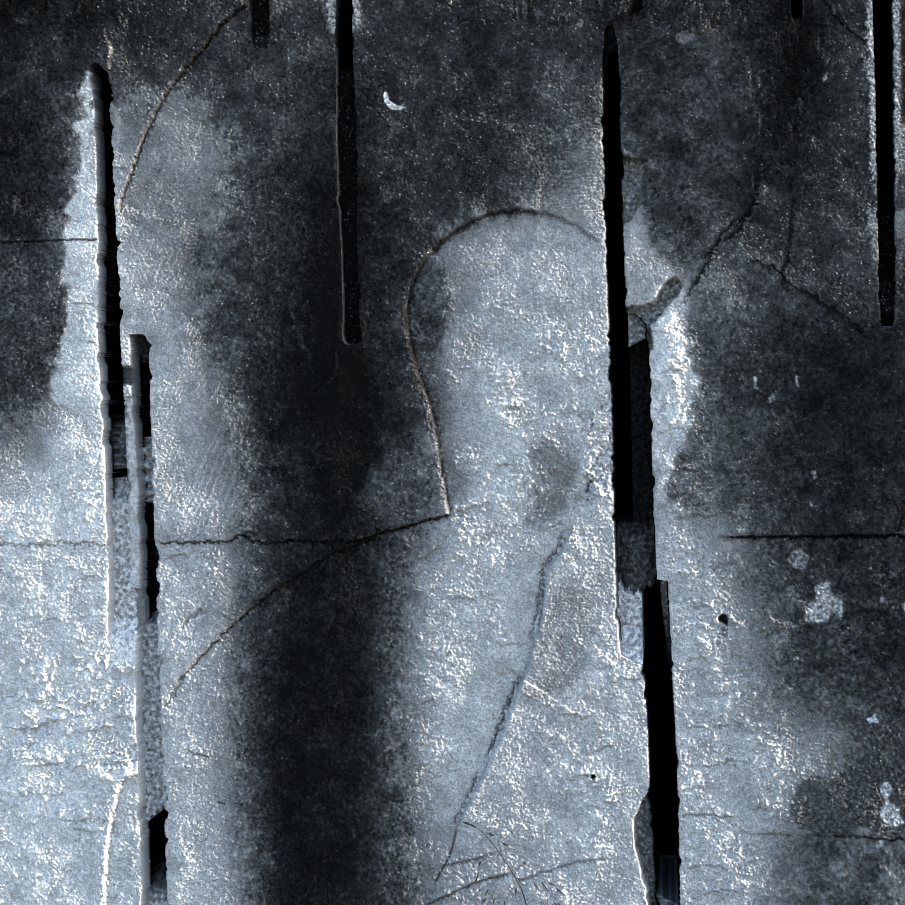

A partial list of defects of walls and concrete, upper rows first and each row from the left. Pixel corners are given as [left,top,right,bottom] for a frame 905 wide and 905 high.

crack [116,3,248,213]
damp [0,0,83,438]
crack [12,236,99,244]
crack [679,159,860,326]
crack [155,531,319,548]
damp [210,53,449,905]
crack [364,207,606,545]
damp [705,277,905,719]
crack [162,607,255,710]
crack [426,512,614,905]
crack [681,813,905,844]
damp [781,834,905,905]